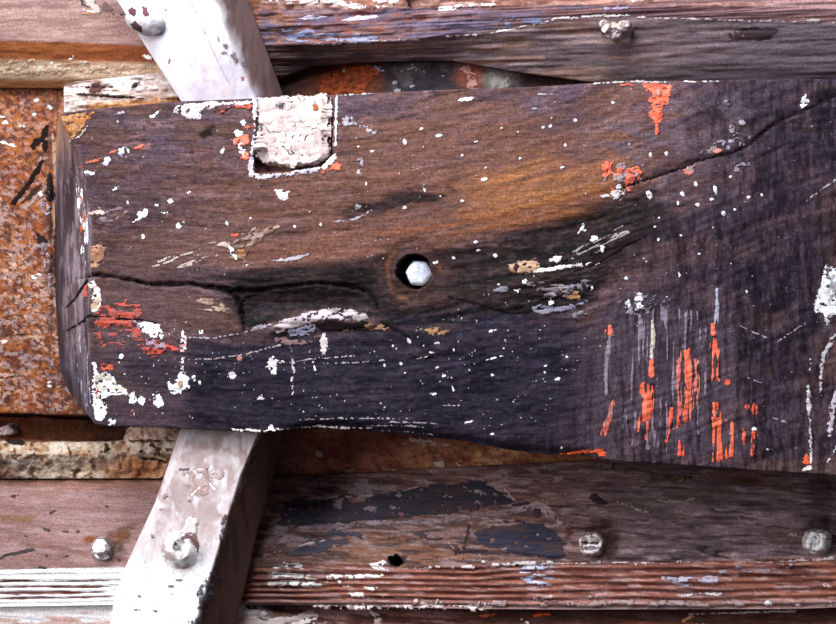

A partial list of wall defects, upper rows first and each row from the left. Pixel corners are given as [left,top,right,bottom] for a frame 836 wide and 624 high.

peeling [281,0,422,46]
corrosion [319,64,386,95]
peeling [174,93,376,180]
crack [623,95,836,188]
crack [573,235,646,272]
peeling [77,279,201,425]
crack [64,273,438,359]
crack [447,295,530,314]
peeling [617,288,731,457]
peeling [711,402,758,463]
peeling [236,468,634,624]
peeling [582,544,836,624]